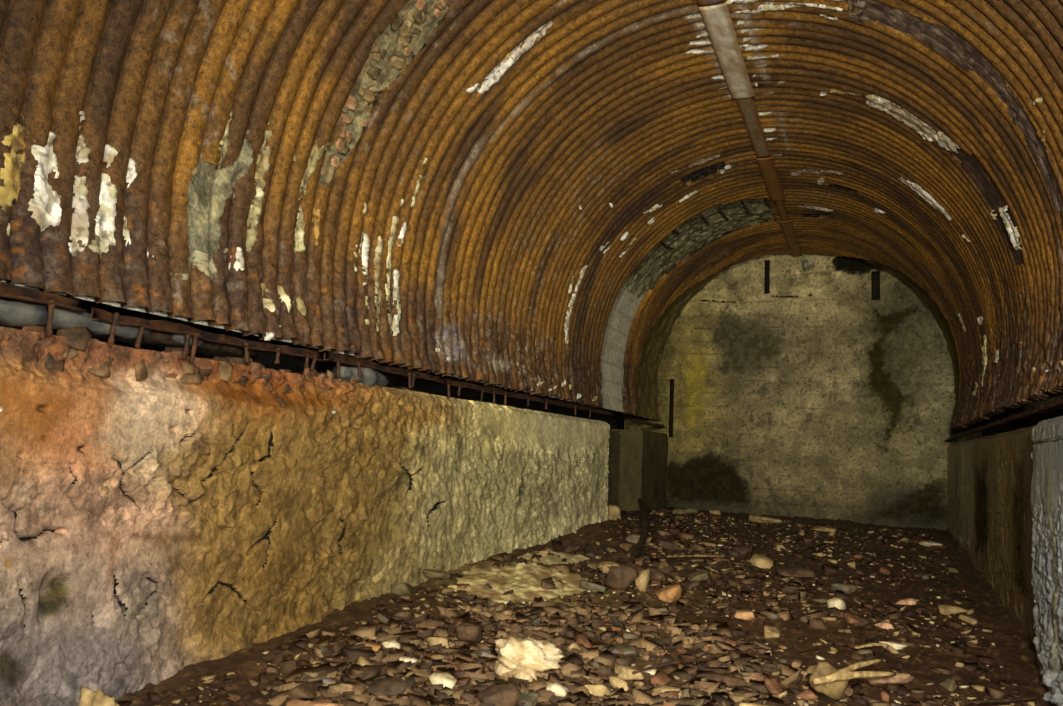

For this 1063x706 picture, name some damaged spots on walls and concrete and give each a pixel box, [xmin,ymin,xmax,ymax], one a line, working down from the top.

peeling [0,110,142,259]
peeling [170,111,272,282]
spalling [293,0,450,252]
peeling [354,158,427,336]
peeling [462,20,553,94]
water stain [868,307,918,451]
crack [0,509,55,543]
crack [114,450,153,503]
crack [113,575,158,616]
crack [174,428,280,568]
crack [203,582,254,611]
water stain [666,454,749,505]